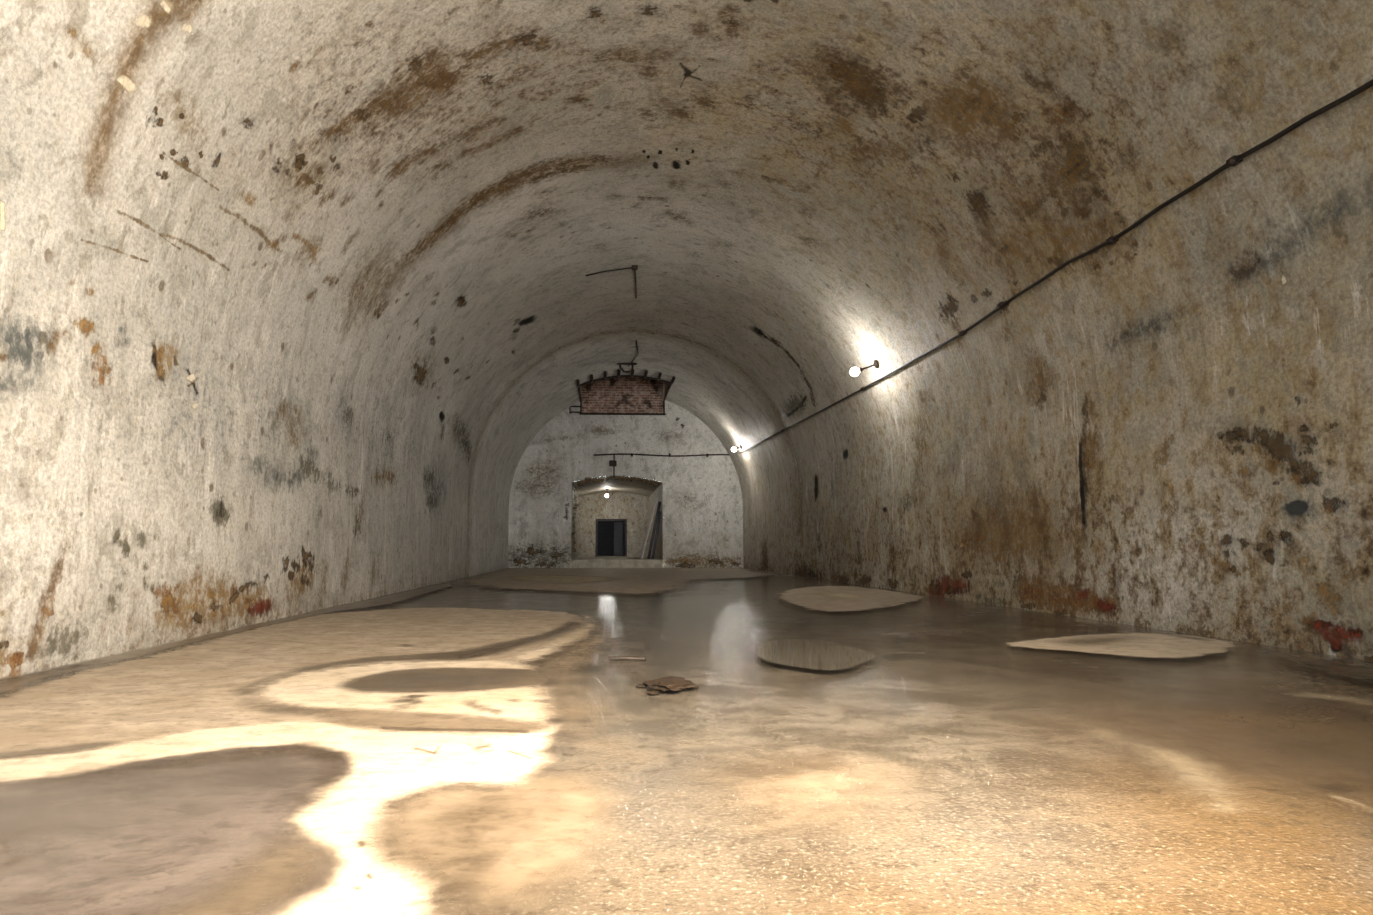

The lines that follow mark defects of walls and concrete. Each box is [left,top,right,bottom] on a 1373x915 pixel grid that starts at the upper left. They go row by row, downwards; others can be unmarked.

damp [96,115,113,148]
damp [114,0,201,95]
damp [156,149,221,180]
damp [272,28,557,207]
damp [812,43,891,117]
damp [910,70,1045,160]
damp [948,173,997,247]
damp [0,326,40,388]
crack [1026,357,1052,408]
crack [1068,394,1101,550]
spalling [1196,425,1345,577]
spalling [1295,552,1373,652]